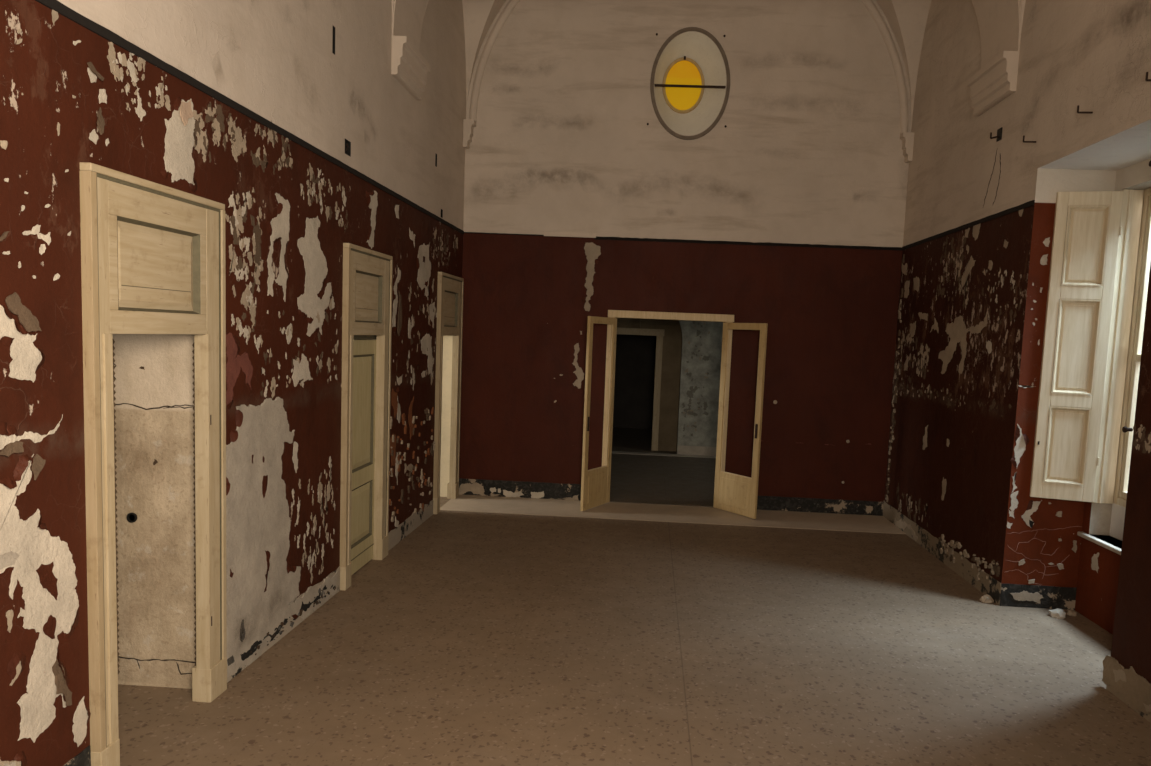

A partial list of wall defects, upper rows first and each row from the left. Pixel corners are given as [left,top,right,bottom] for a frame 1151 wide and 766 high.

peeling [87,42,293,193]
flaking render [582,242,601,311]
peeling [0,292,45,382]
crack [113,363,195,410]
peeling [225,163,348,677]
peeling [389,209,458,527]
peeling [885,223,1042,542]
peeling [1007,424,1062,529]
peeling [0,414,91,766]
flaking render [1010,579,1043,602]
crack [1007,526,1080,584]
flaking render [1102,655,1151,714]